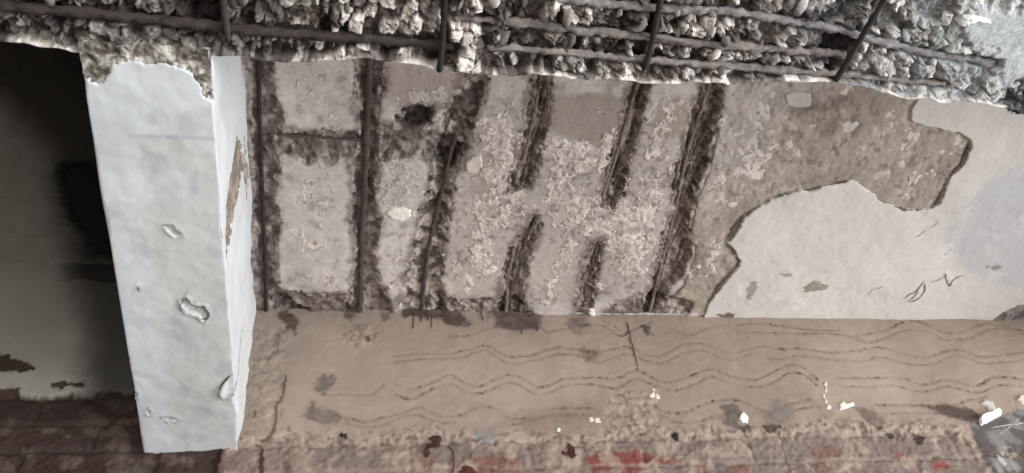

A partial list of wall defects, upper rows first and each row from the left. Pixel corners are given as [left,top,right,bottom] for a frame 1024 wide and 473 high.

spalling [0,0,1024,316]
peeling [0,354,35,373]
peeling [51,381,83,390]
crack [619,322,639,371]